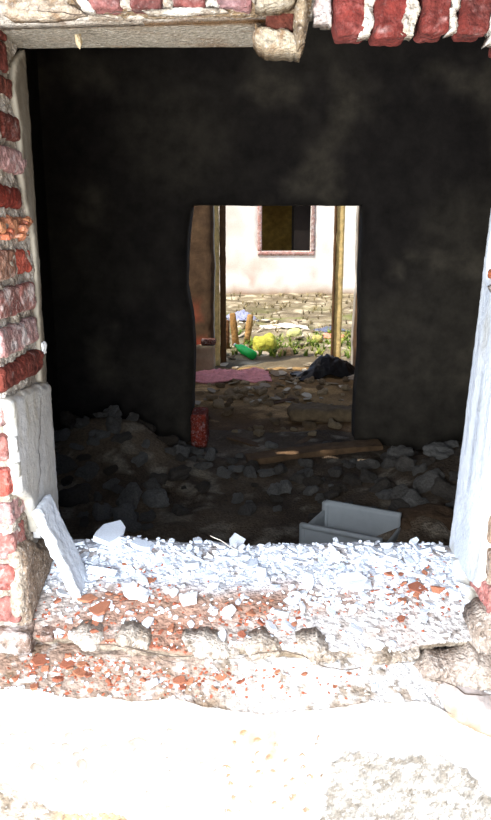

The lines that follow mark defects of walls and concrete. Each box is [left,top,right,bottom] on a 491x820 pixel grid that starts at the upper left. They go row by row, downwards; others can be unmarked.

flaking render [0,49,283,693]
crack [99,644,491,696]
flaking render [281,211,491,737]